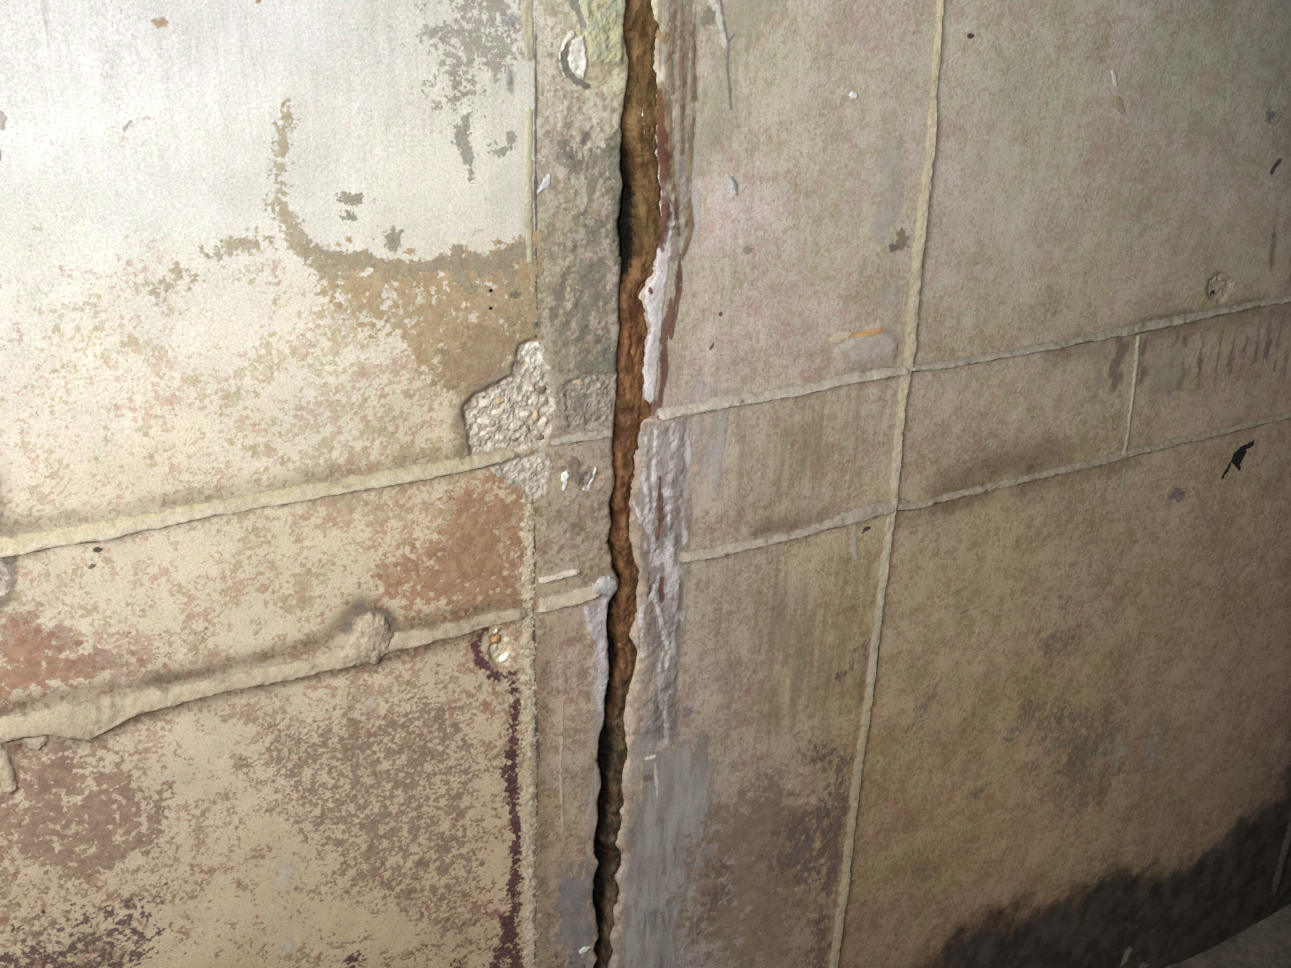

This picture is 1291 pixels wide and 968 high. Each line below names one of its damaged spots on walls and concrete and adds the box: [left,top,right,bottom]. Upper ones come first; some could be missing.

water stain [147,261,198,306]
water stain [198,98,623,401]
corrosion [649,9,697,416]
spalling [0,558,13,597]
spalling [455,341,617,504]
crack [593,0,662,968]
water stain [619,408,856,968]
water stain [1005,692,1127,807]
water stain [926,766,1291,968]